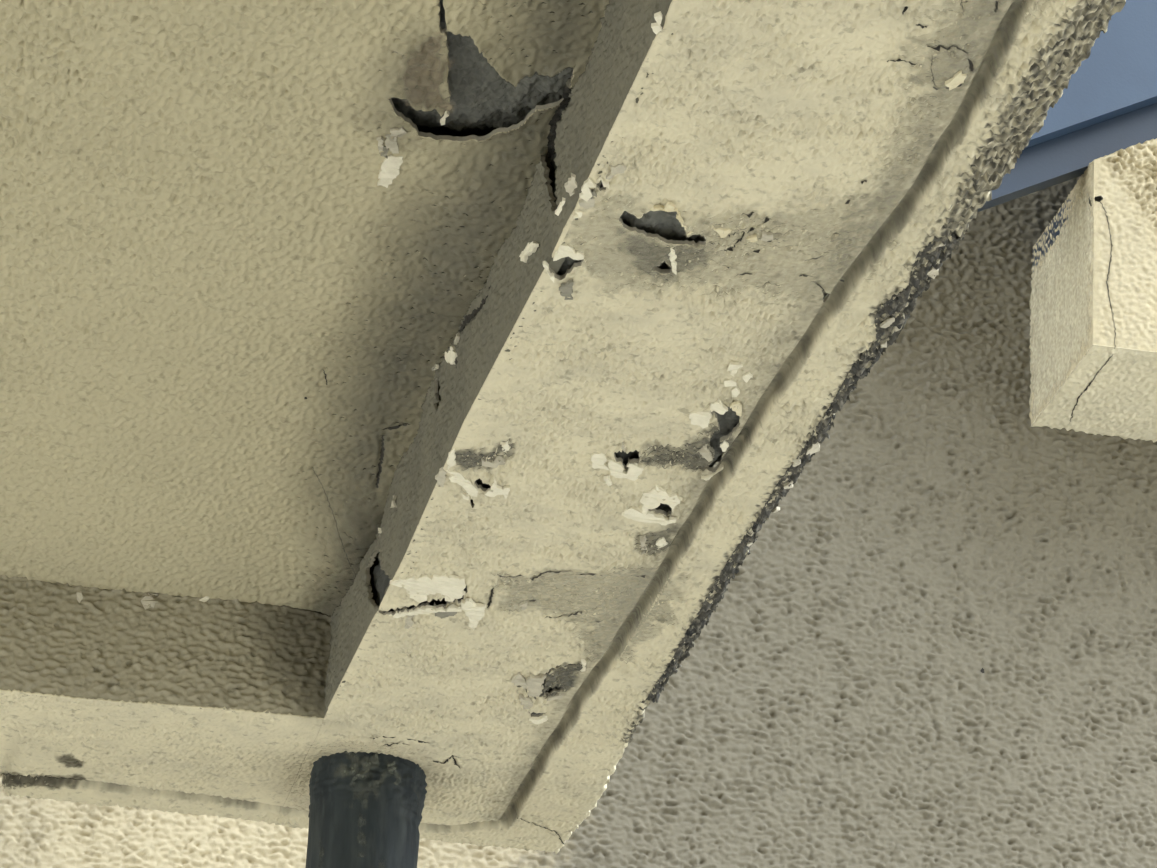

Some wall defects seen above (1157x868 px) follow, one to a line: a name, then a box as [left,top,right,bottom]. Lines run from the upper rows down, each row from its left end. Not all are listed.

flaking render [377,22,573,188]
crack [547,86,571,207]
flaking render [519,241,584,300]
flaking render [620,202,774,277]
crack [1070,202,1116,422]
flaking render [435,439,513,501]
flaking render [591,361,753,555]
spalling [645,233,965,703]
flaking render [372,552,672,725]